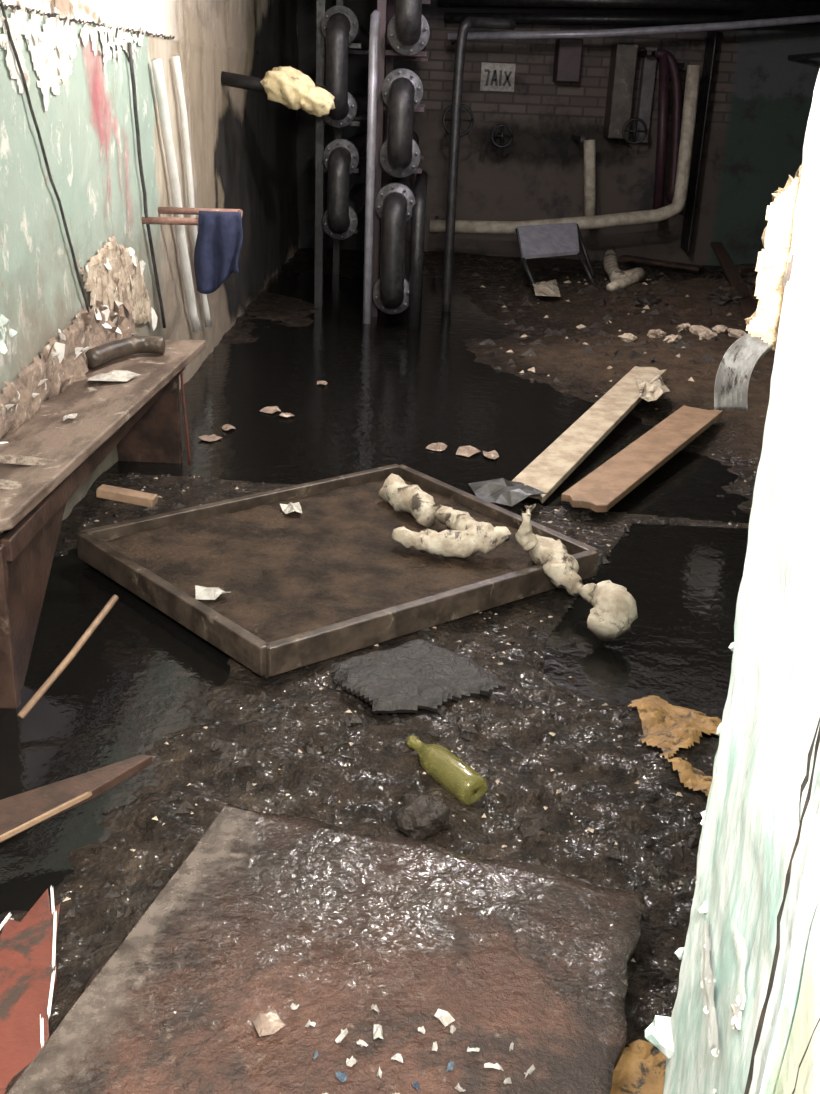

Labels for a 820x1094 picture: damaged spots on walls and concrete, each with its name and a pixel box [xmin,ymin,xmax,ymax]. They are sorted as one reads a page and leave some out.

peeling [0,0,146,111]
spalling [0,235,158,444]
spalling [744,164,802,350]